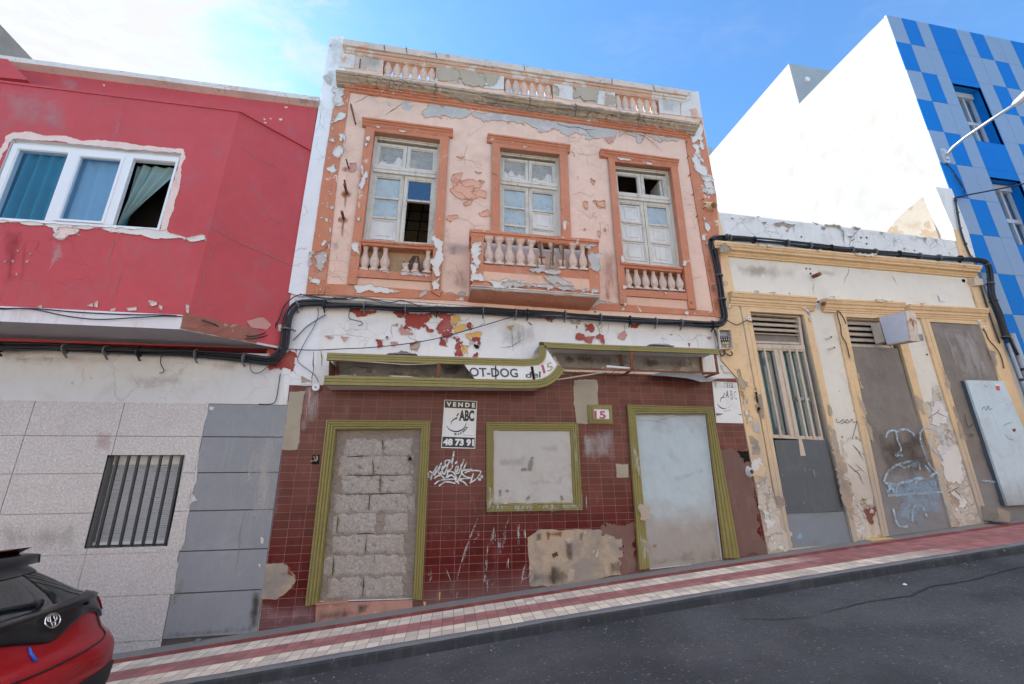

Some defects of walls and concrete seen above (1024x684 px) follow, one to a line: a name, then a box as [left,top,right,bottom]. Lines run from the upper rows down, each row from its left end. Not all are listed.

peeling [322,75,716,196]
peeling [0,131,207,242]
peeling [445,171,498,223]
flaking render [308,205,334,292]
peeling [348,308,377,317]
peeling [333,311,482,379]
spalling [721,363,792,559]
peeling [828,404,881,540]
flaking render [915,384,981,527]
spalling [259,563,296,600]
spalling [527,504,651,587]